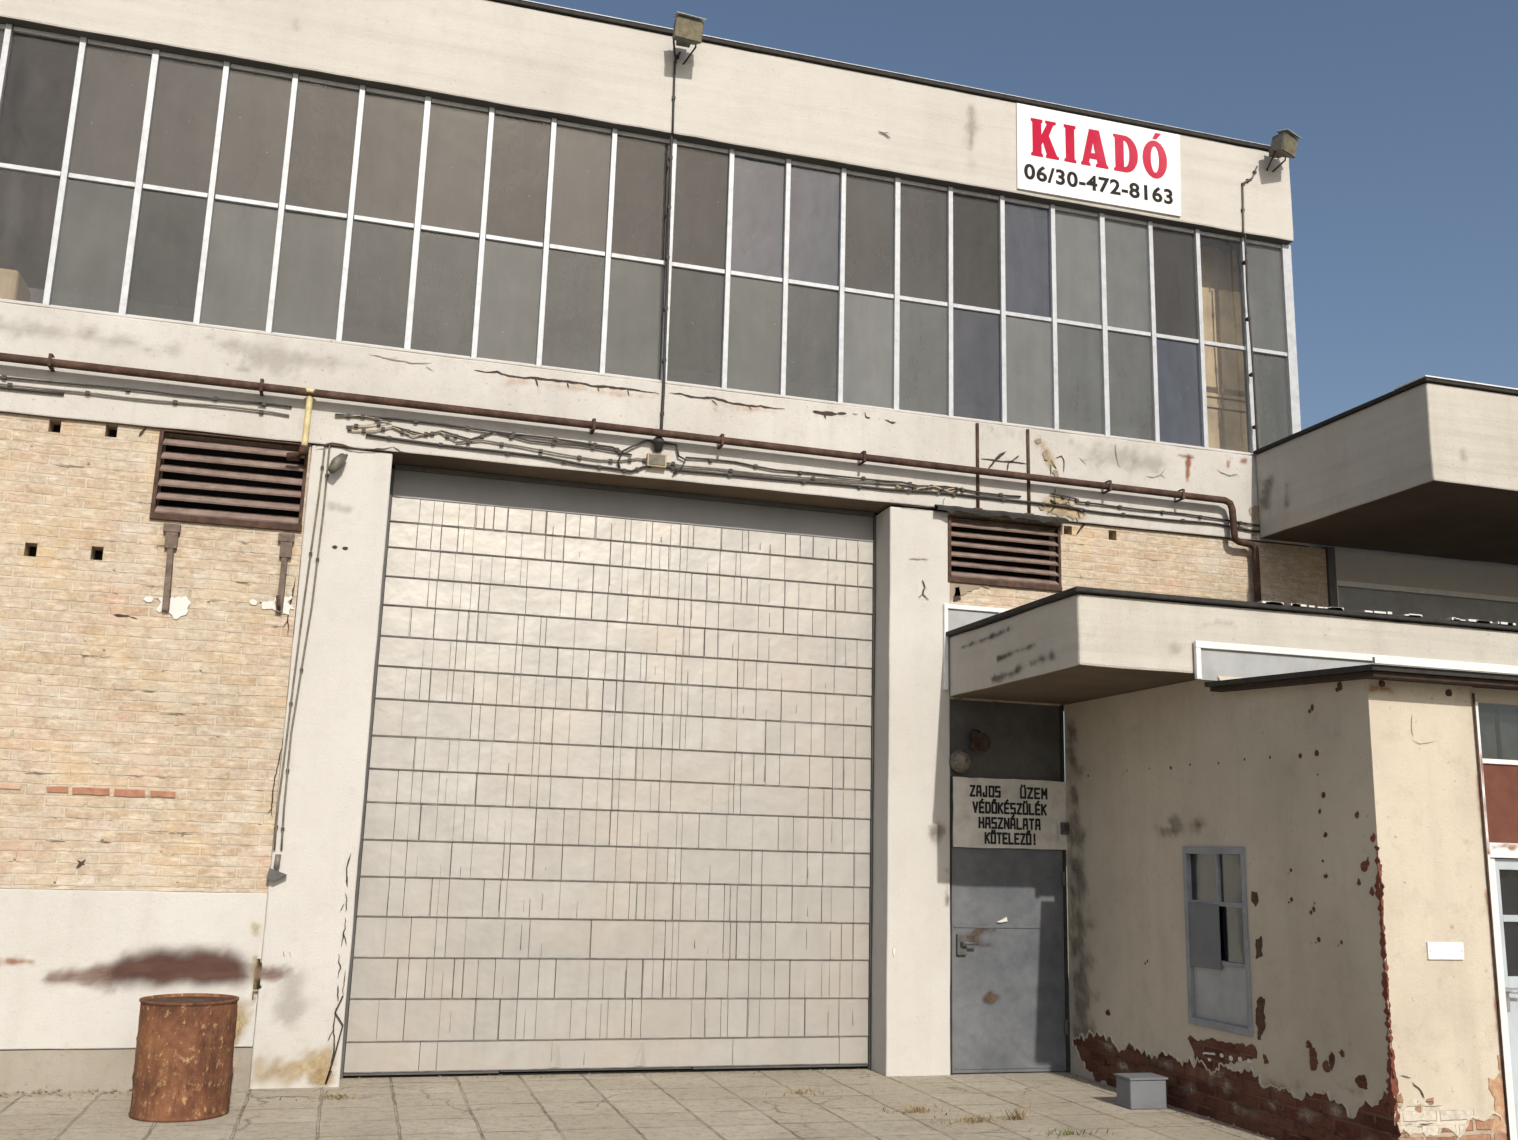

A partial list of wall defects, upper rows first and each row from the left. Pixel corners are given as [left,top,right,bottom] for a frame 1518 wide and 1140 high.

spalling [1034,438,1059,477]
spalling [1038,497,1087,522]
rust [47,951,283,985]
crack [328,854,351,1062]
peeling [1072,833,1507,1140]
damp [234,1005,247,1044]
damp [256,1050,331,1083]